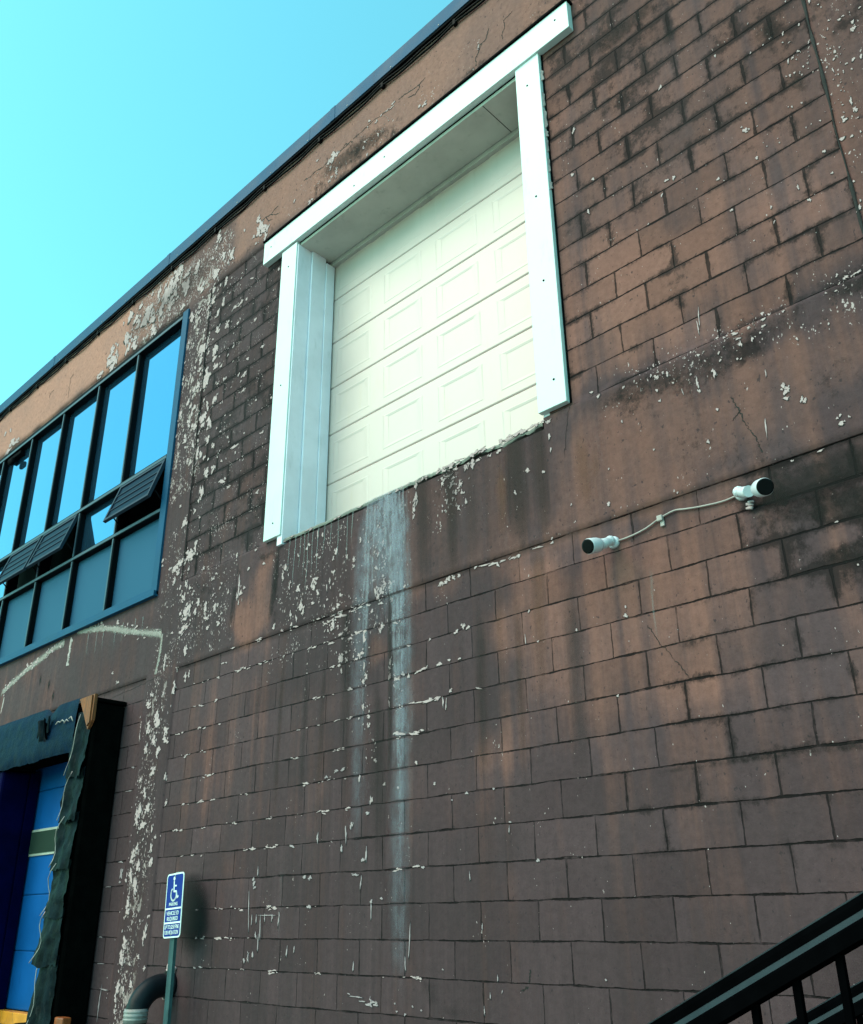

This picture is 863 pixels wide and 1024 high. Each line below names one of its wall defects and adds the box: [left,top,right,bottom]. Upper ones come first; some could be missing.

crack [306,79,424,179]
peeling [762,6,862,141]
peeling [96,229,254,529]
peeling [650,317,767,402]
crack [731,398,763,453]
peeling [780,382,808,404]
peeling [161,539,266,656]
spalling [255,418,554,763]
peeling [97,660,268,1017]
peeling [215,870,288,970]